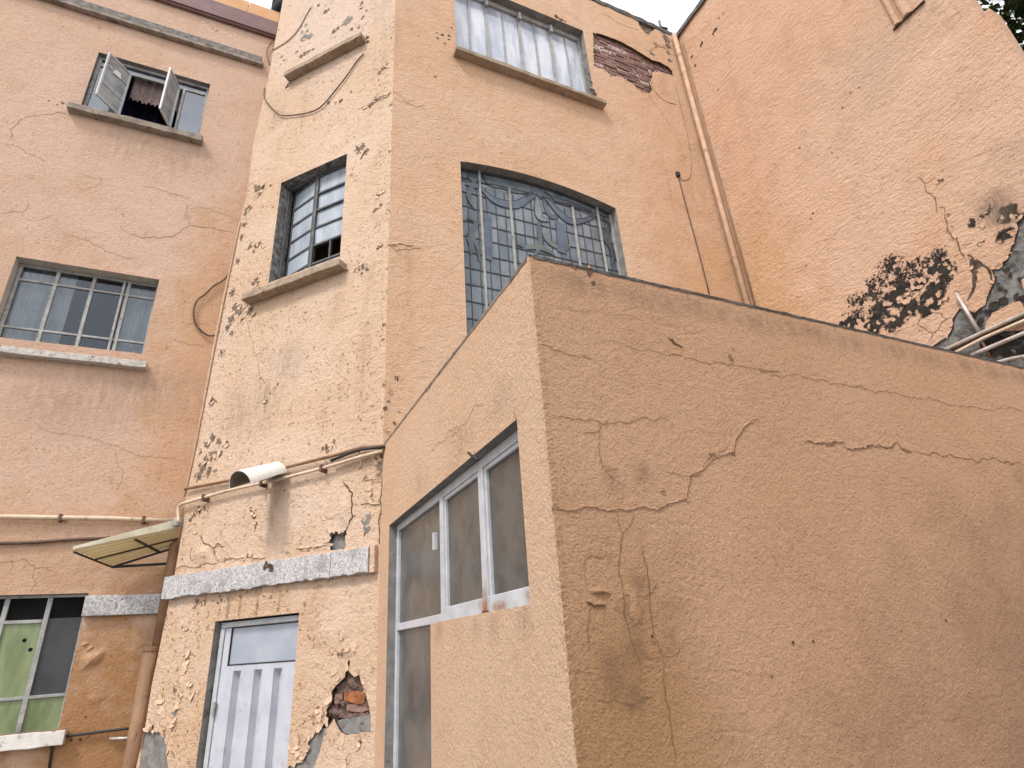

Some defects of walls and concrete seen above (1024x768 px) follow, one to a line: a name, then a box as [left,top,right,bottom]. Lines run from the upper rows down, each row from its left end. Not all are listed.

flaking render [588,24,673,95]
crack [3,112,65,159]
crack [70,184,235,259]
crack [919,177,970,258]
peeling [839,202,1024,367]
crack [540,308,1023,412]
peeling [193,433,229,481]
crack [177,533,266,569]
flaking render [329,529,346,550]
crack [552,416,1024,768]
flaking render [140,650,195,768]
flaking render [287,641,371,768]